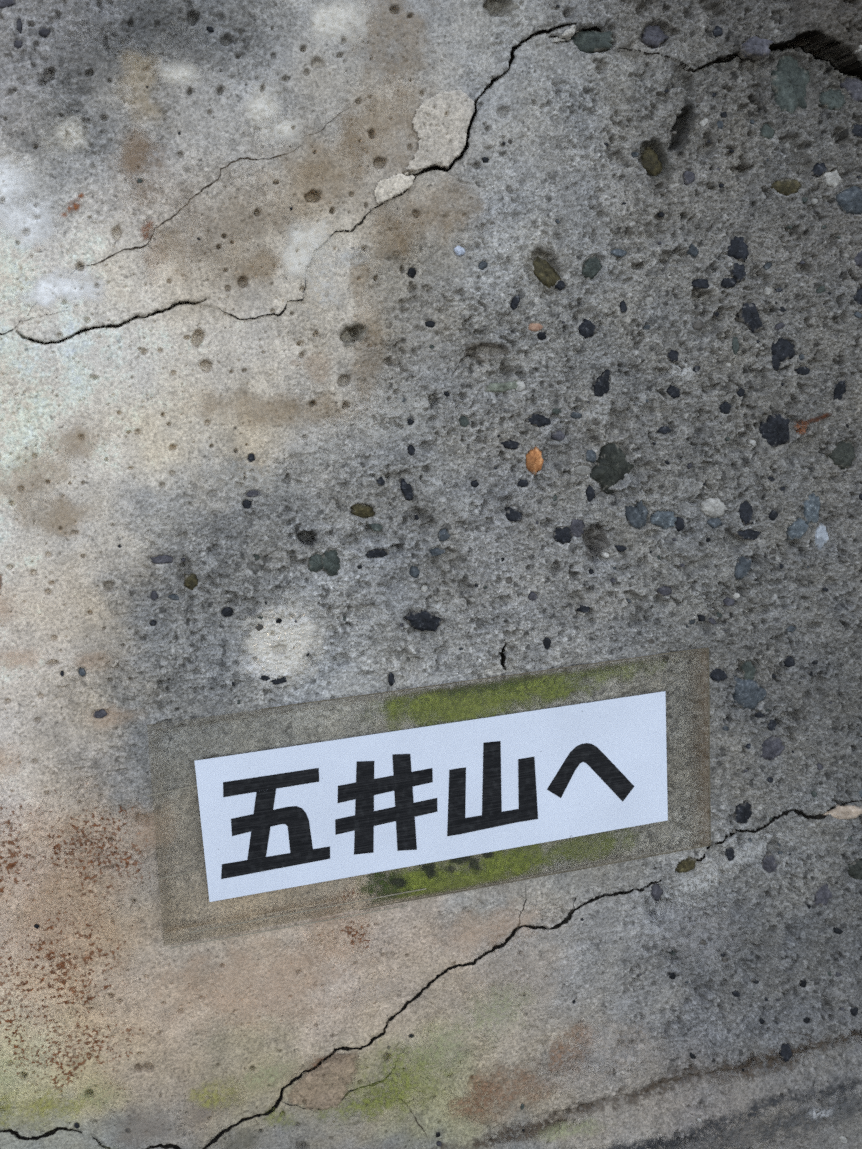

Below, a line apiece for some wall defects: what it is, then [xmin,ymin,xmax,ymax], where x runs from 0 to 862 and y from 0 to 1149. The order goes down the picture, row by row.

peeling [552,25,576,42]
crack [769,30,862,81]
crack [0,23,740,344]
peeling [374,90,475,204]
corrosion [0,804,150,1093]
crack [146,800,862,1149]
crack [0,1127,110,1149]